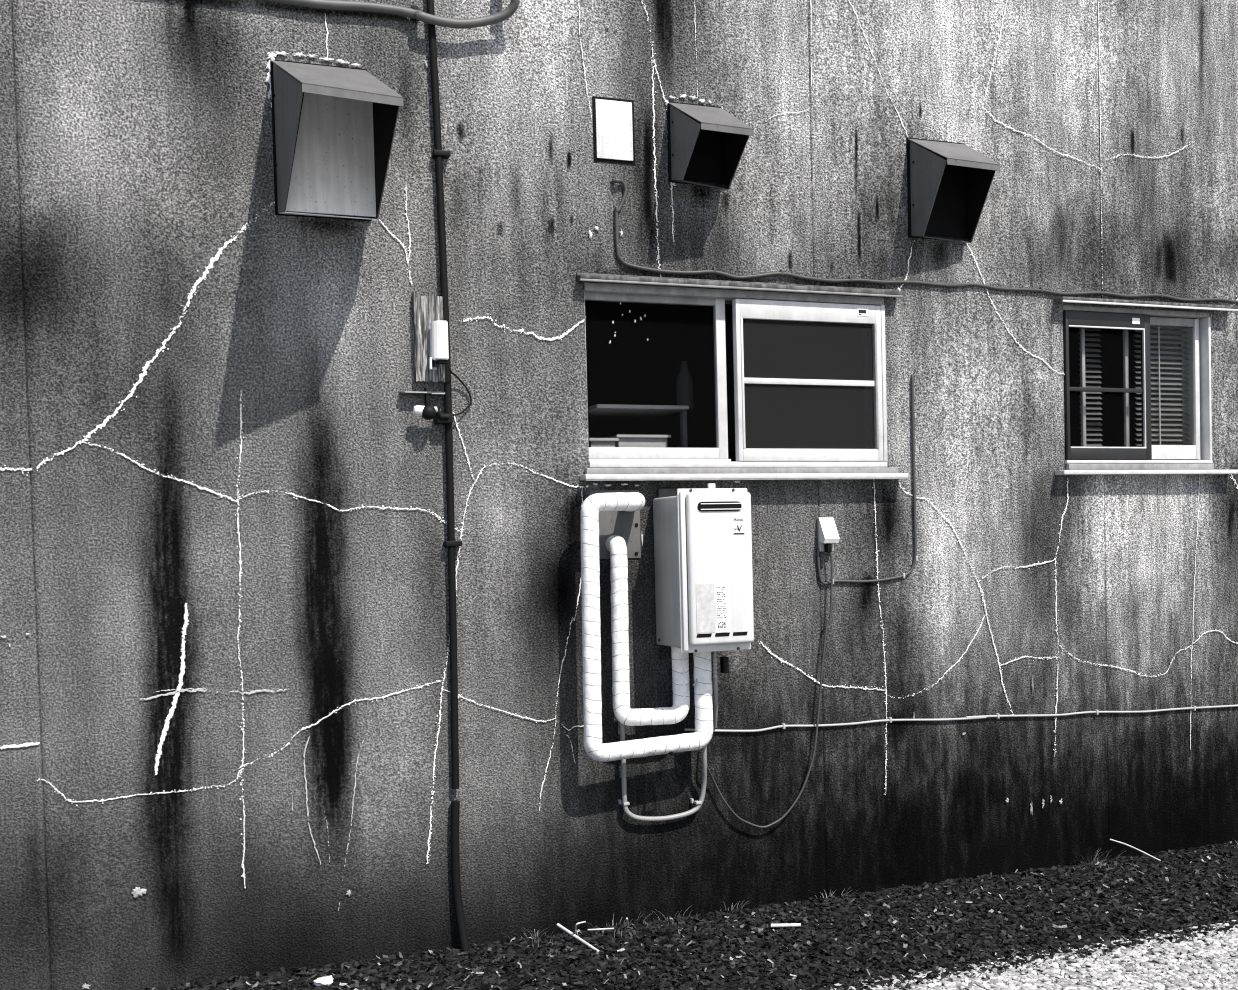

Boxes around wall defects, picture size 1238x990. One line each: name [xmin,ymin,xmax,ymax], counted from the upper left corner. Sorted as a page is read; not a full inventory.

crack [578,0,592,117]
water stain [644,121,652,235]
crack [641,1,674,276]
water stain [657,0,672,54]
crack [757,0,812,126]
crack [848,0,908,137]
crack [962,0,1193,234]
crack [967,244,1065,375]
water stain [146,420,196,960]
crack [0,187,586,888]
water stain [299,425,351,835]
crack [759,478,1238,795]